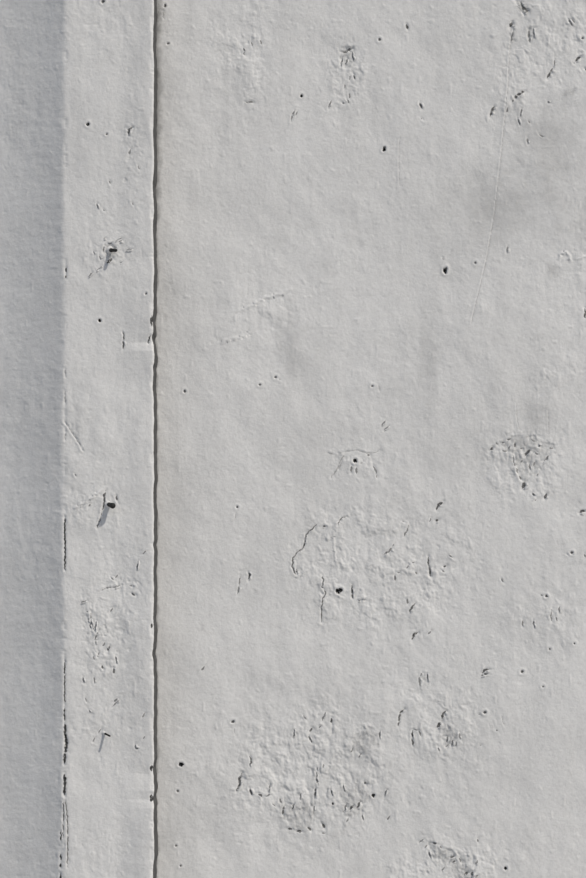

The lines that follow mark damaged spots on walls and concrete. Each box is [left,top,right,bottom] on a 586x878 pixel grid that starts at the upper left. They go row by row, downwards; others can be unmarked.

crack [291,517,347,575]
crack [320,577,328,622]